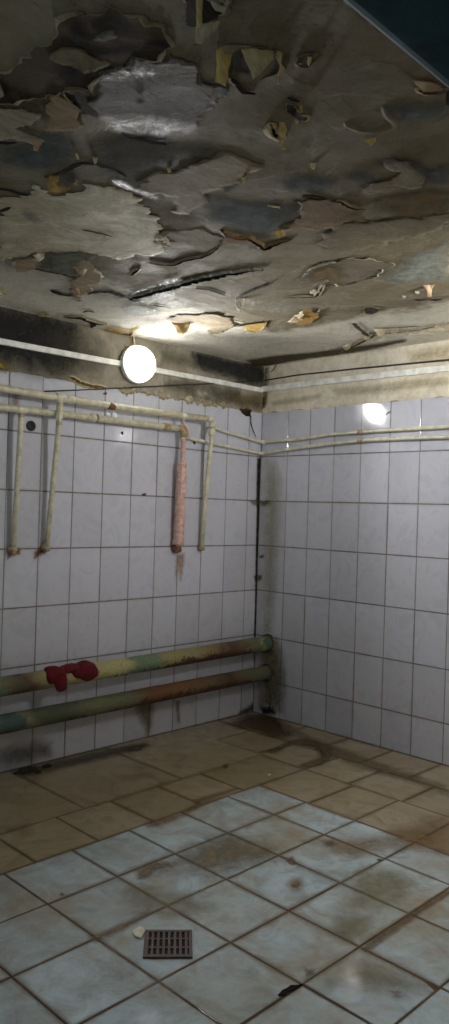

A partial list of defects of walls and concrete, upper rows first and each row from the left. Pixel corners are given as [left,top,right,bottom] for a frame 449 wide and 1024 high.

peeling [183,0,232,44]
peeling [0,7,175,152]
peeling [215,44,321,95]
peeling [413,79,447,96]
peeling [263,97,311,150]
peeling [0,151,263,302]
peeling [283,158,449,287]
peeling [166,298,267,335]
peeling [288,309,323,325]